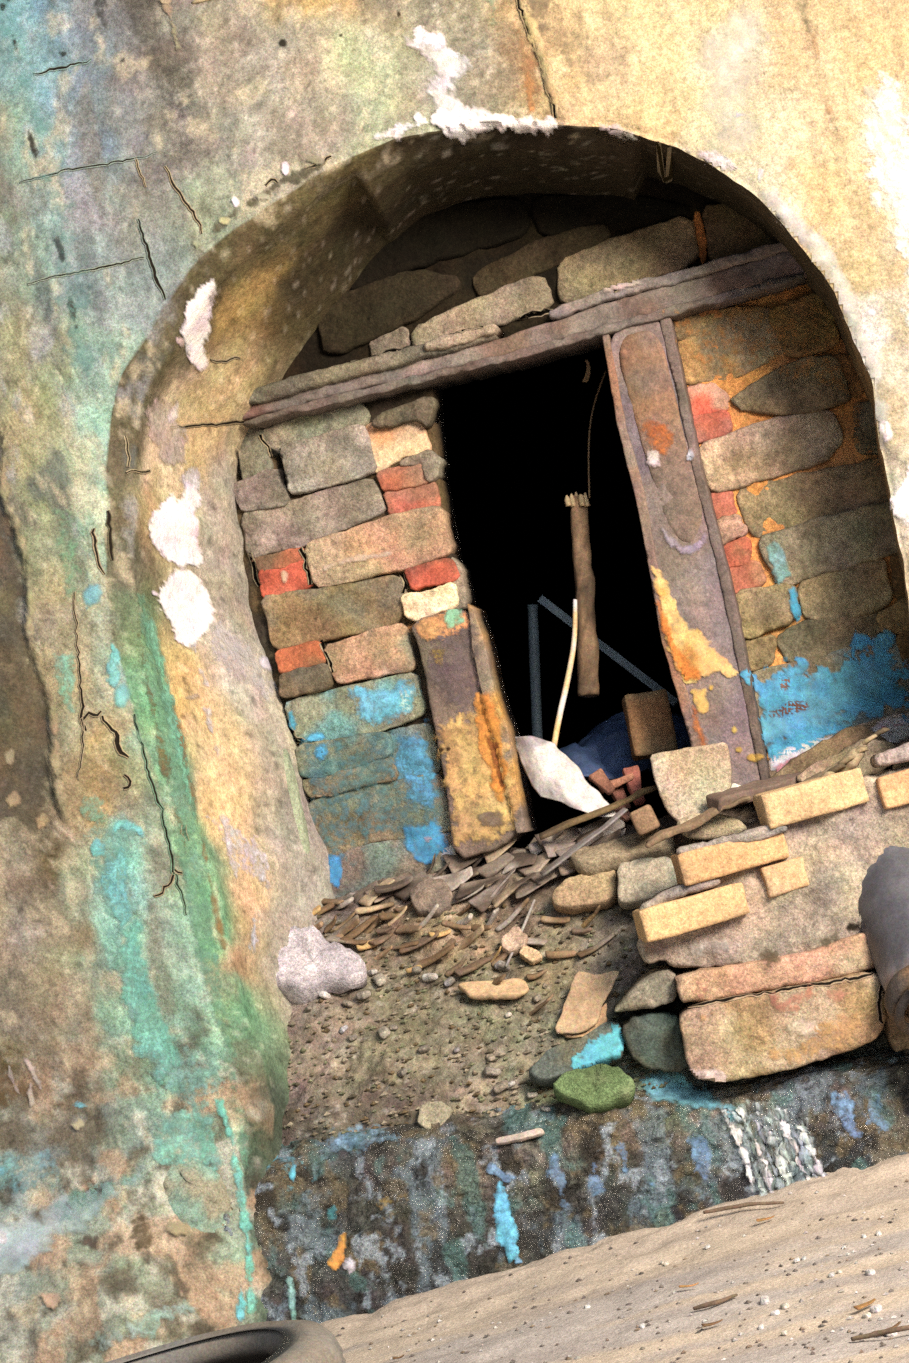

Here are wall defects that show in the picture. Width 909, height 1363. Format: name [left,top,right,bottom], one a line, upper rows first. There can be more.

damp [374,26,558,142]
crack [516,0,558,118]
crack [20,151,203,234]
damp [600,124,638,140]
damp [865,72,909,273]
crack [27,219,167,300]
crack [123,436,151,474]
damp [890,466,909,523]
crack [90,510,114,575]
crack [72,592,189,915]